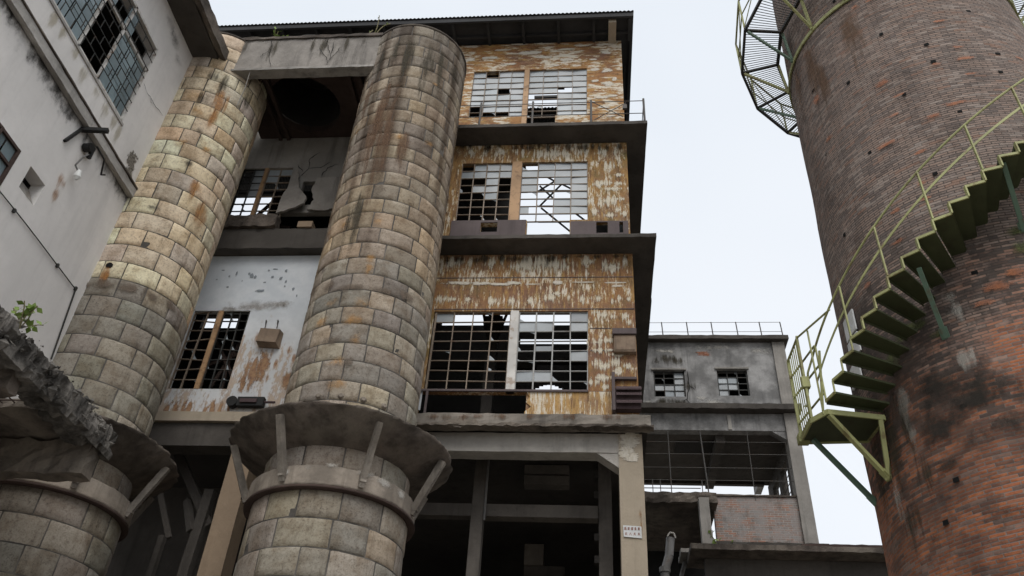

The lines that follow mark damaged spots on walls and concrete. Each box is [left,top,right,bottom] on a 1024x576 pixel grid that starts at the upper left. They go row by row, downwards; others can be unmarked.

peeling [464,43,618,117]
peeling [468,149,627,219]
peeling [435,255,631,325]
rust [163,399,230,412]
rust [237,352,277,393]
peeling [587,336,631,391]